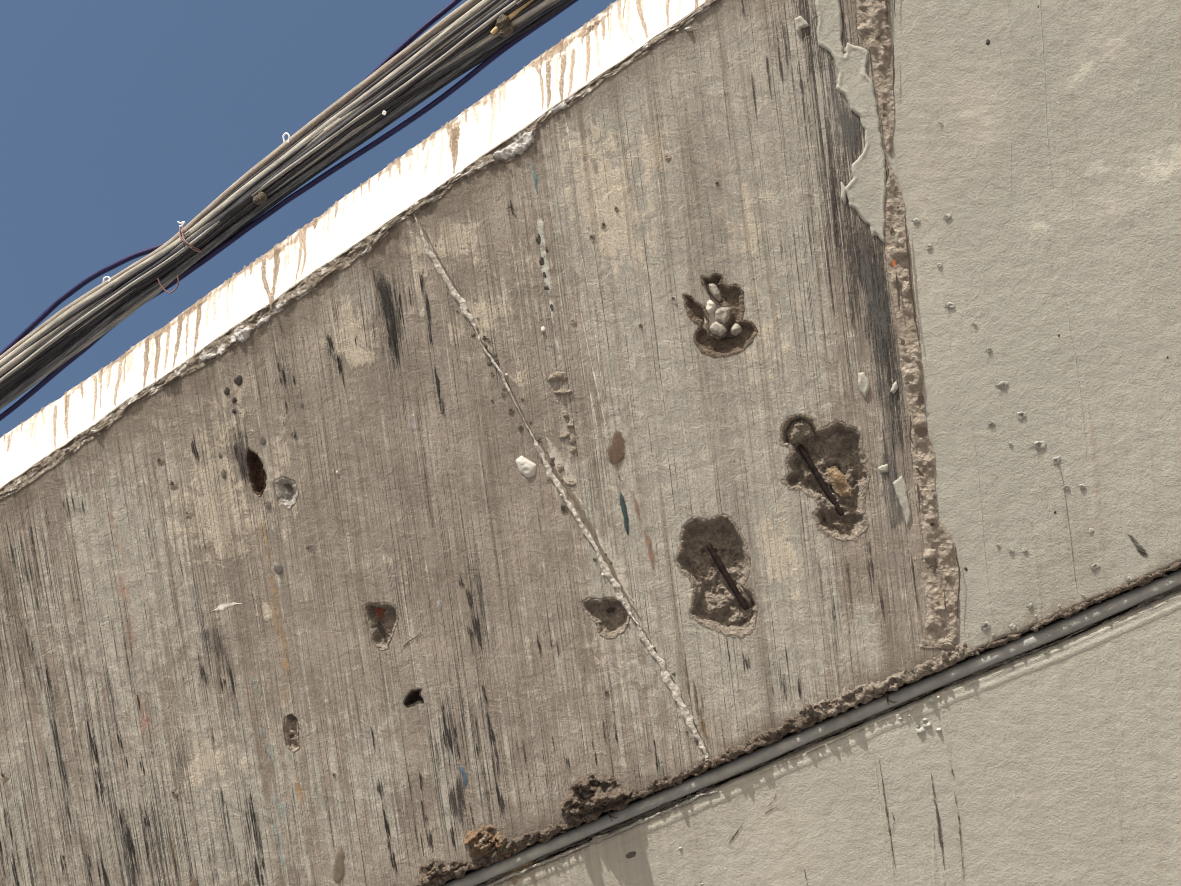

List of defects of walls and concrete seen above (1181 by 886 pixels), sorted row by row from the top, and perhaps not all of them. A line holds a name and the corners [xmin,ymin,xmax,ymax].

peeling [795,0,886,243]
spalling [0,0,720,499]
spalling [682,273,758,358]
crack [896,219,920,347]
damp [218,435,247,483]
crack [414,213,709,758]
spalling [674,514,758,638]
spalling [779,413,912,542]
damp [868,535,886,629]
crack [927,409,994,622]
crack [744,585,1181,777]
crack [478,786,718,886]